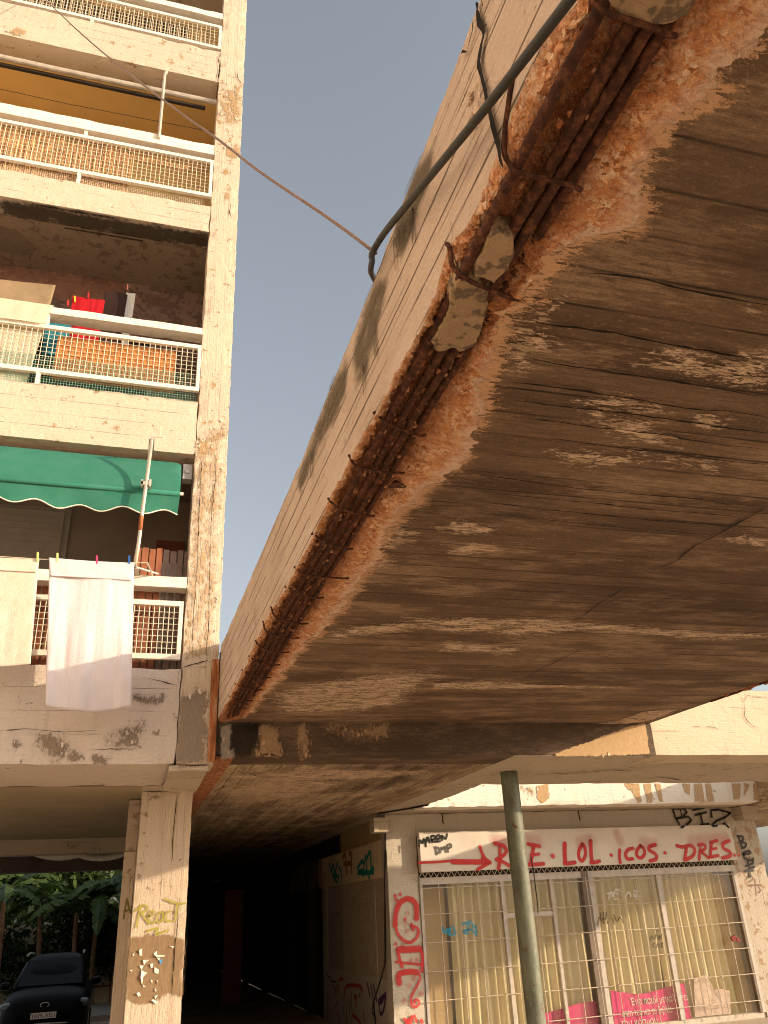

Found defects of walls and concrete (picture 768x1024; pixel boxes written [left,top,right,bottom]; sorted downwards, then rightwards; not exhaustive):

leakage [0,200,209,247]
leakage [298,280,385,488]
spalling [132,0,768,810]
peeling [13,718,147,766]